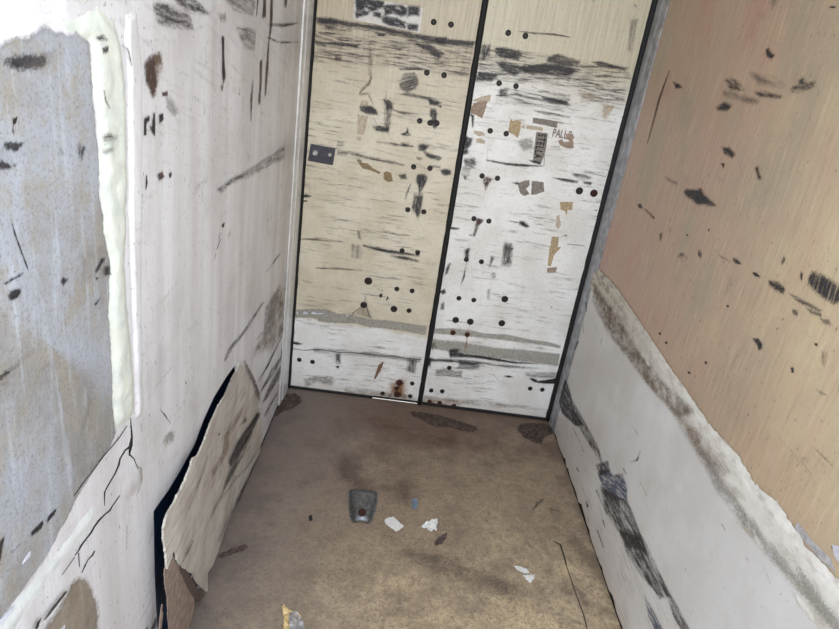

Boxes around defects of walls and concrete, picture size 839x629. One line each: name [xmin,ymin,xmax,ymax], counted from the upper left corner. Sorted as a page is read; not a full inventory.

leakage [585,287,692,421]
crack [62,418,138,575]
leakage [687,428,839,629]
peeling [795,522,839,573]